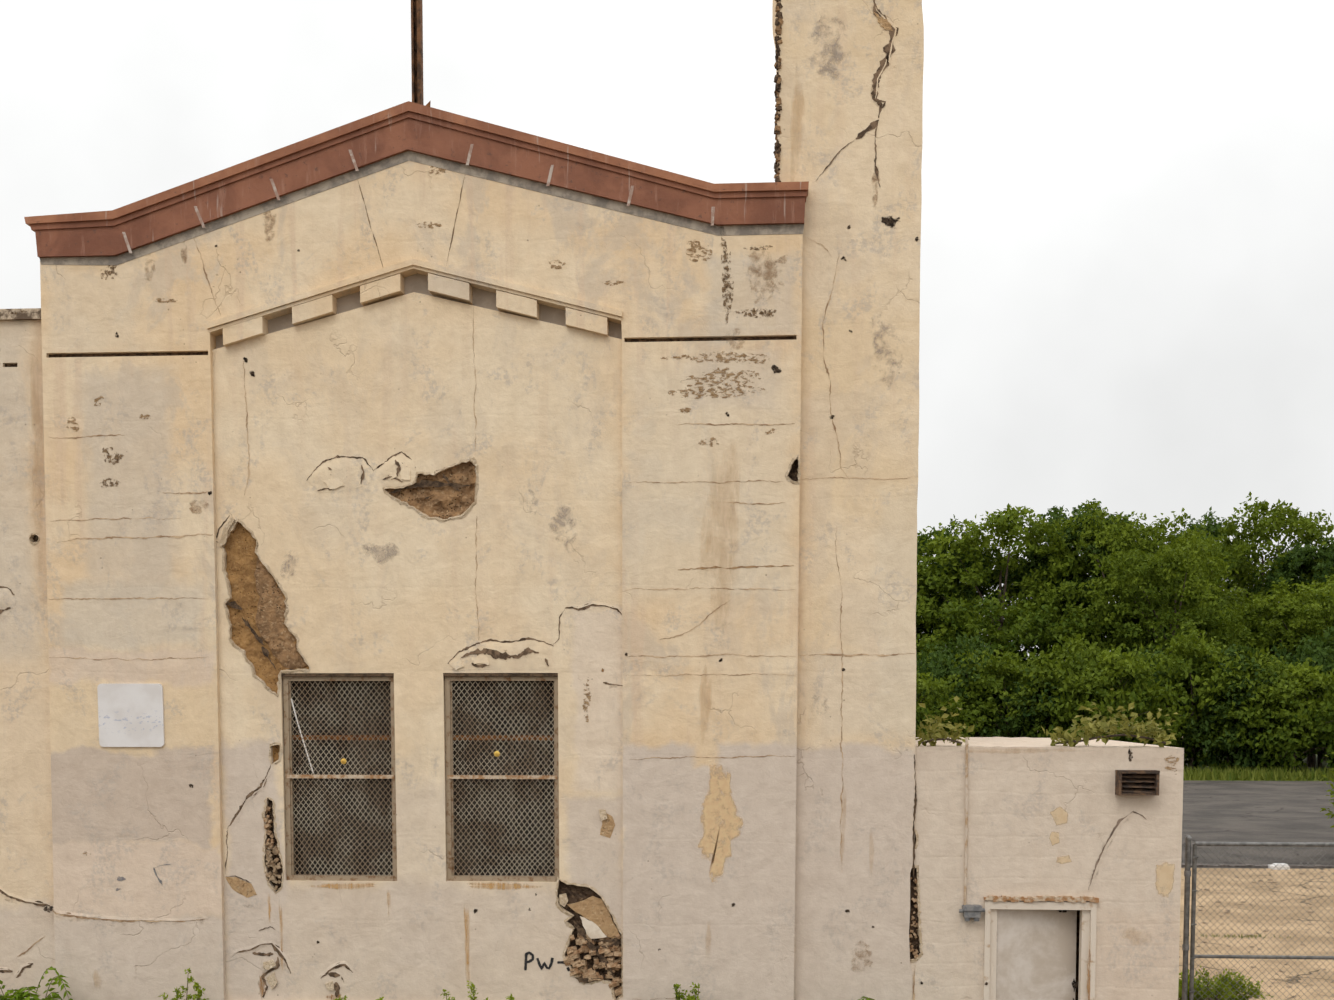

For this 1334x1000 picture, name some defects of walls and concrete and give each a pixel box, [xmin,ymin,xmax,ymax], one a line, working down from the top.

spalling [773,0,783,182]
crack [819,0,899,186]
peeling [686,241,712,262]
peeling [661,351,766,417]
flaking render [382,457,479,522]
flaking render [216,515,311,697]
flaking render [225,797,285,898]
crack [1088,811,1146,890]
crack [0,886,208,978]
flaking render [555,877,623,1000]
flaking render [909,865,923,963]